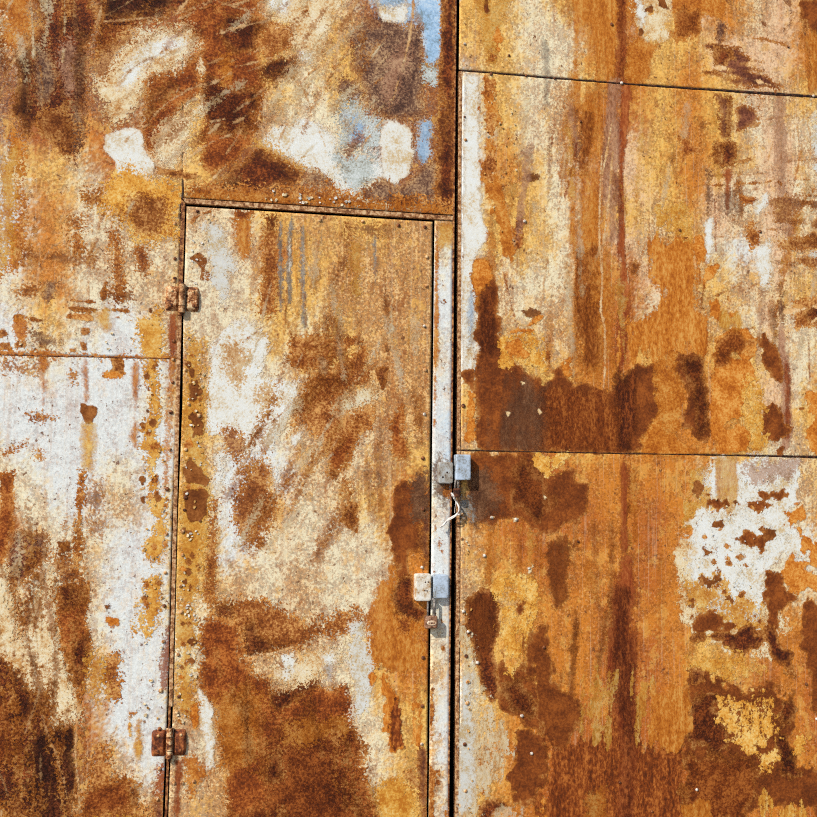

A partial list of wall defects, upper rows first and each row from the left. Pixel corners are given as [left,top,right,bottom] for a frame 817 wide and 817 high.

rust [0,0,455,403]
rust [0,312,148,426]
rust [160,313,177,493]
rust [173,0,817,817]
rust [0,438,165,817]
rust [159,626,170,693]
peeling [669,451,807,662]